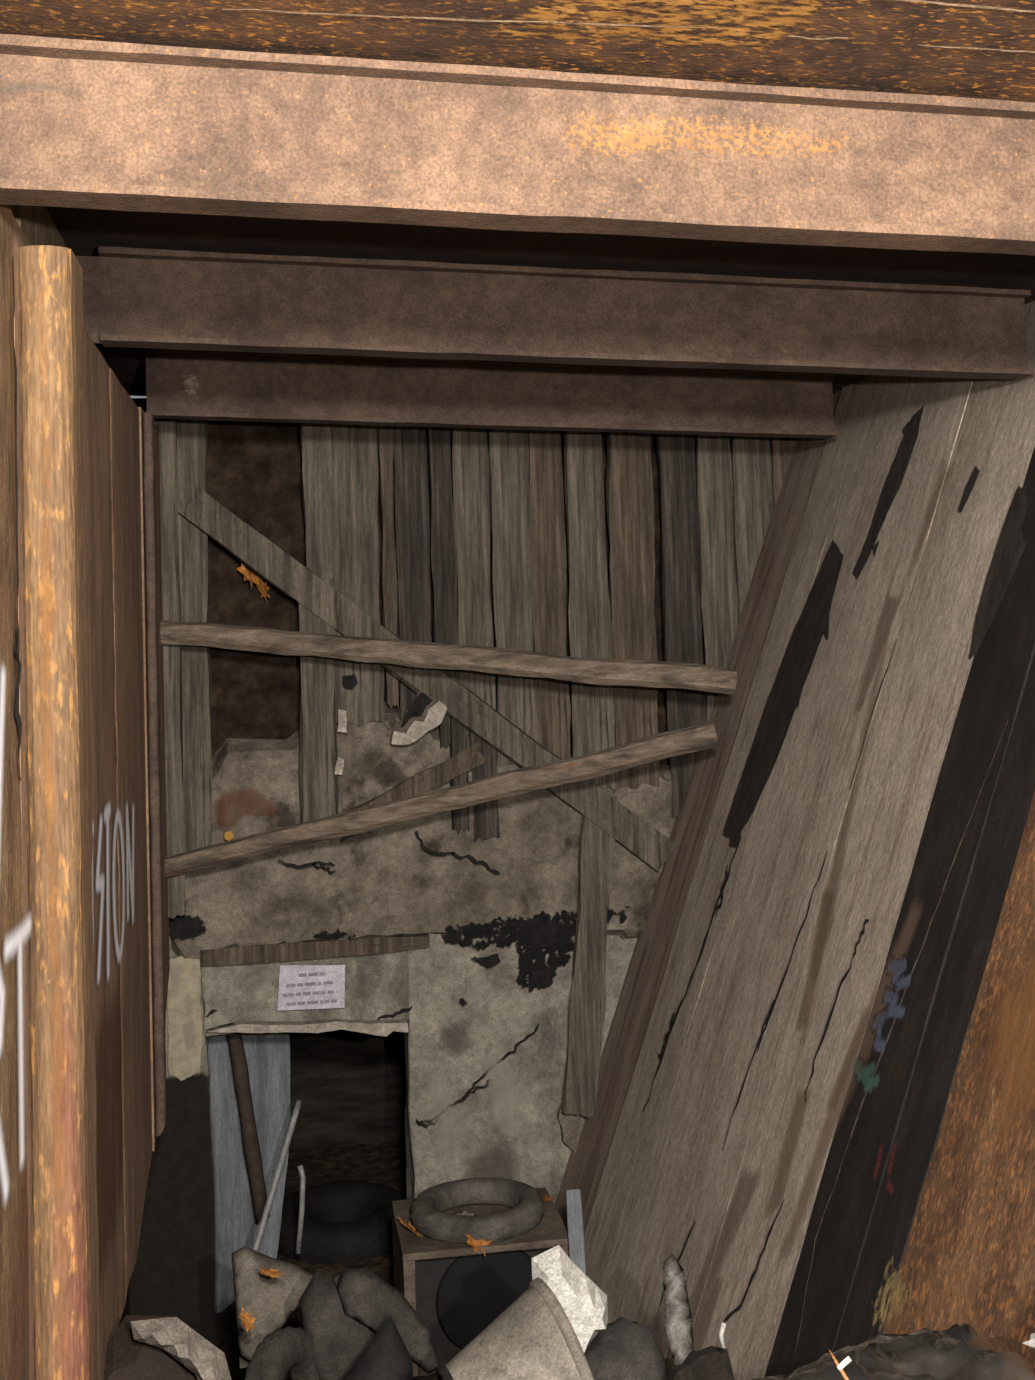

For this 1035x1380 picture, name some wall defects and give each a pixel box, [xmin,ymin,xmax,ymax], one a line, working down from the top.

corrosion [486,0,822,51]
crack [12,255,22,780]
crack [415,831,500,874]
peeling [441,910,577,992]
peeling [607,906,629,924]
crack [416,1023,539,1129]